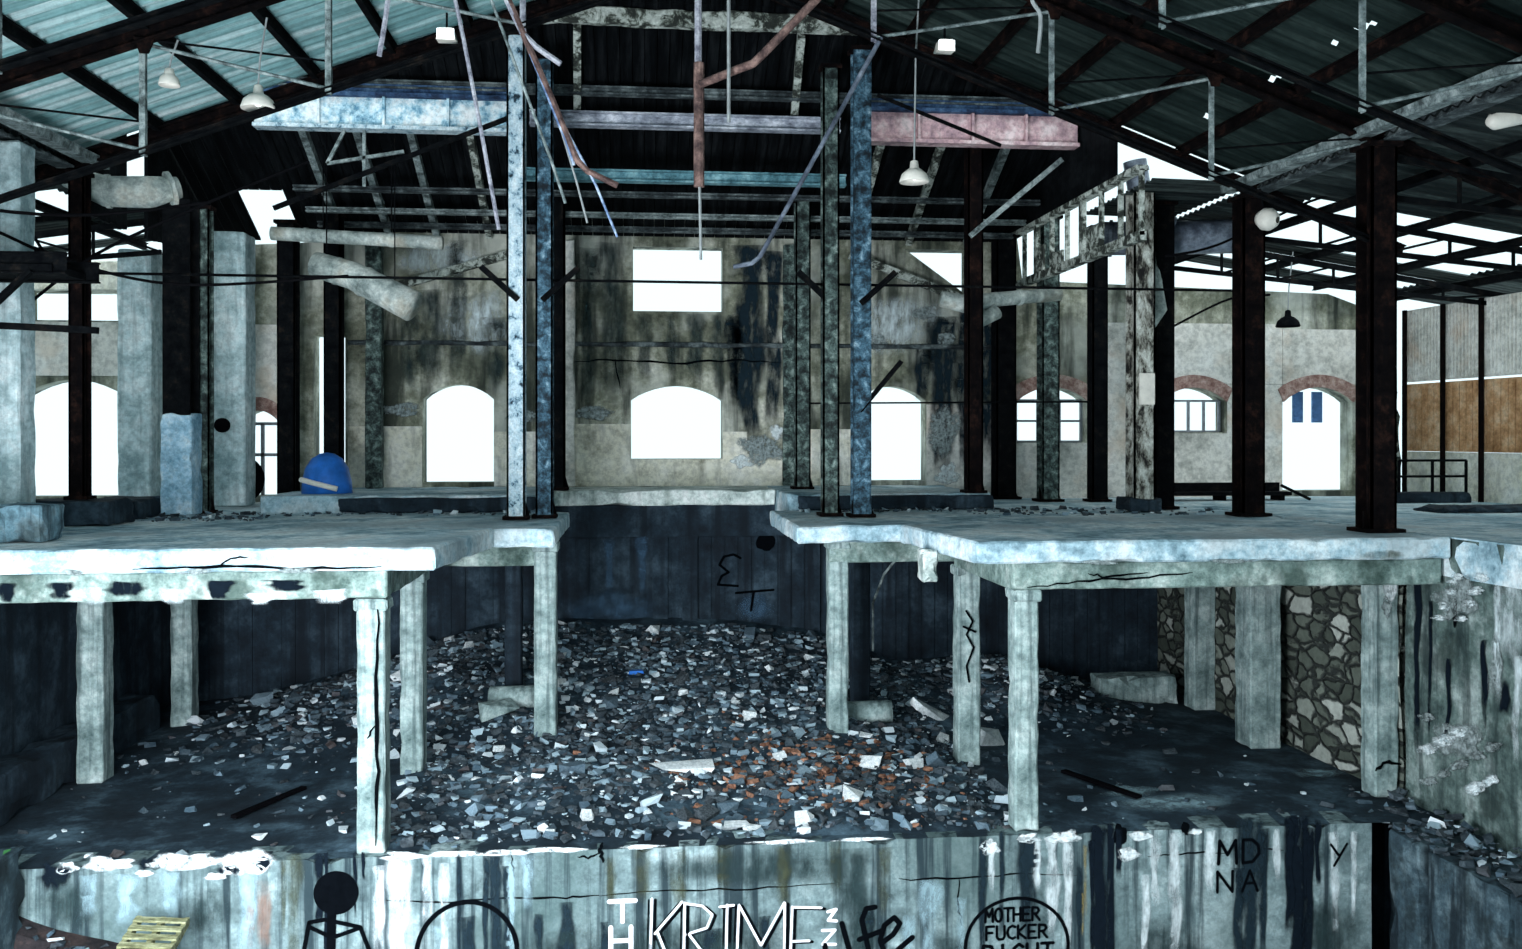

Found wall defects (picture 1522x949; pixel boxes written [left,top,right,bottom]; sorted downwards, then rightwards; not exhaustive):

water stain [575,244,782,434]
spalling [1381,539,1522,858]
water stain [41,863,86,919]
water stain [119,858,174,905]
peeling [57,850,271,880]
water stain [194,900,220,928]
water stain [218,856,284,940]
water stain [315,852,328,881]
water stain [978,824,1122,949]
water stain [1142,841,1196,949]
water stain [1206,833,1214,879]
water stain [1233,815,1356,949]